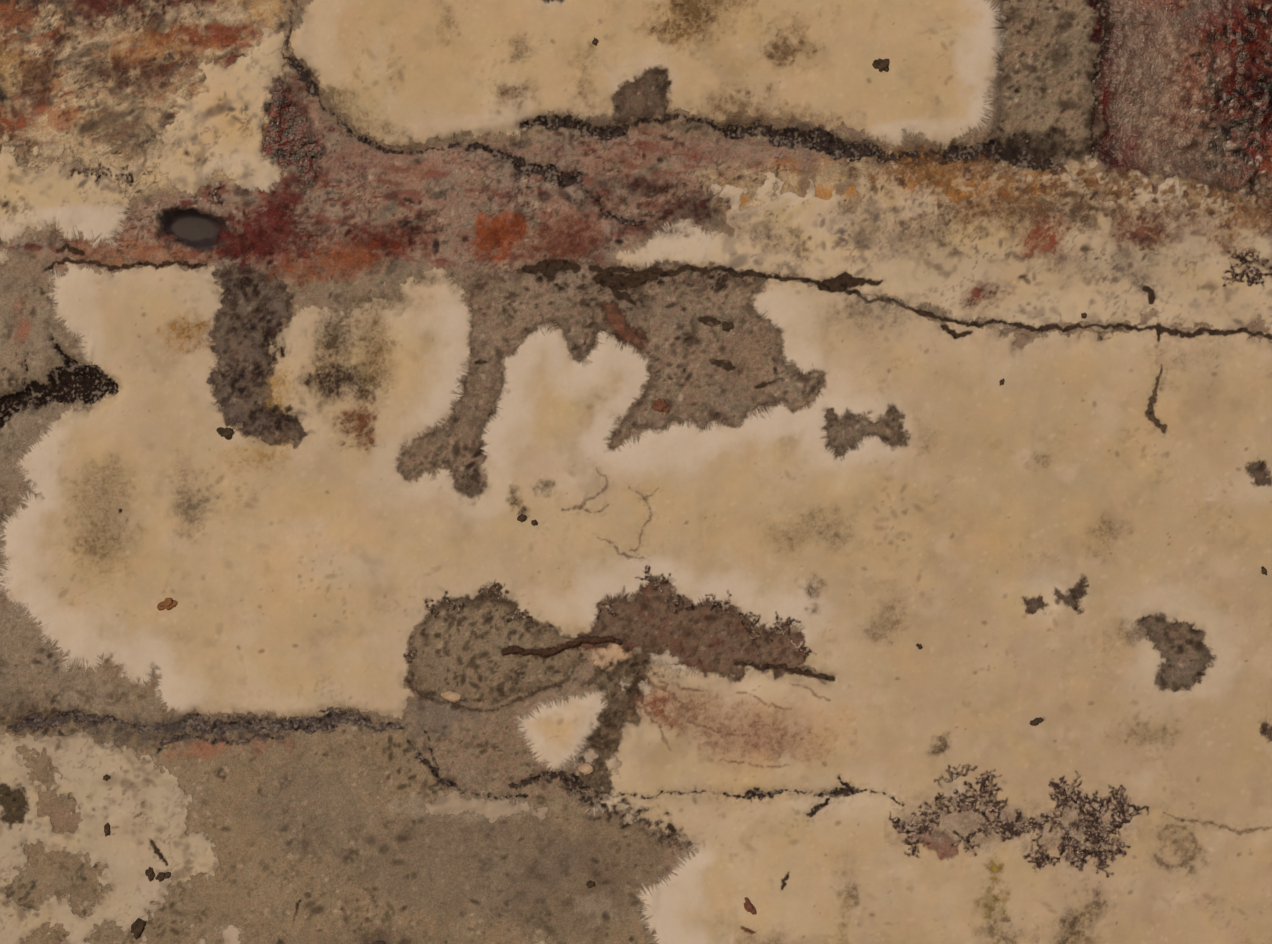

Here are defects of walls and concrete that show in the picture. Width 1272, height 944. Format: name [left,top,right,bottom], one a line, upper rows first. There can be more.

rust [68,0,247,88]
rust [208,183,413,281]
rust [631,179,729,225]
crack [283,0,1114,226]
flaking render [612,0,1272,335]
rust [851,148,1272,259]
crack [0,336,119,428]
crack [522,259,1272,433]
flaking render [0,254,1272,944]
crack [7,707,904,817]